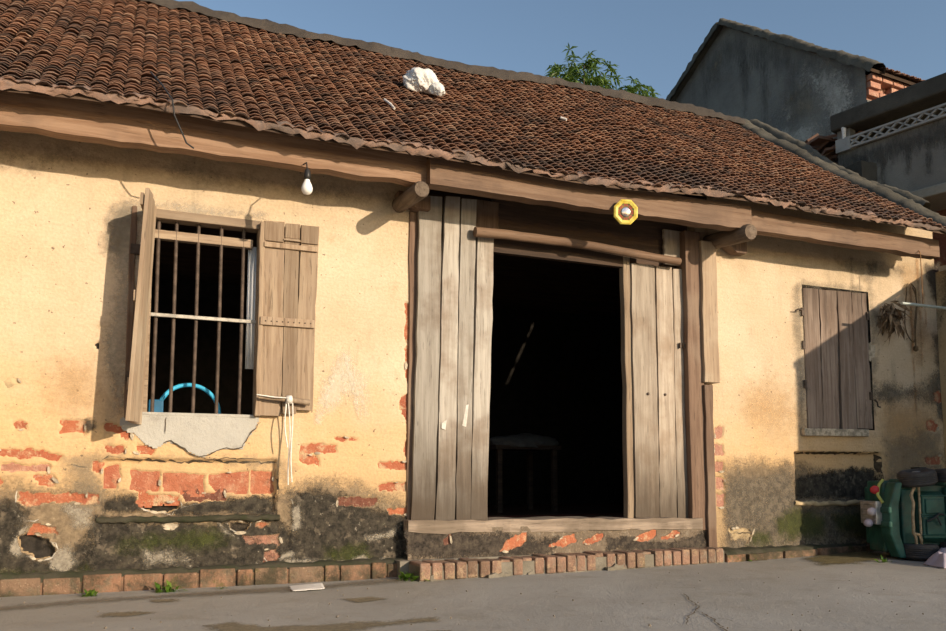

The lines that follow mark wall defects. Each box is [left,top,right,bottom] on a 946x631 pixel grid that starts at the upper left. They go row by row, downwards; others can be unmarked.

spalling [299,436,356,466]
spalling [378,394,407,470]
spalling [10,523,74,572]
water stain [0,478,408,574]
spalling [336,482,406,508]
spalling [387,507,407,516]
water stain [722,460,886,565]
crack [684,594,732,631]